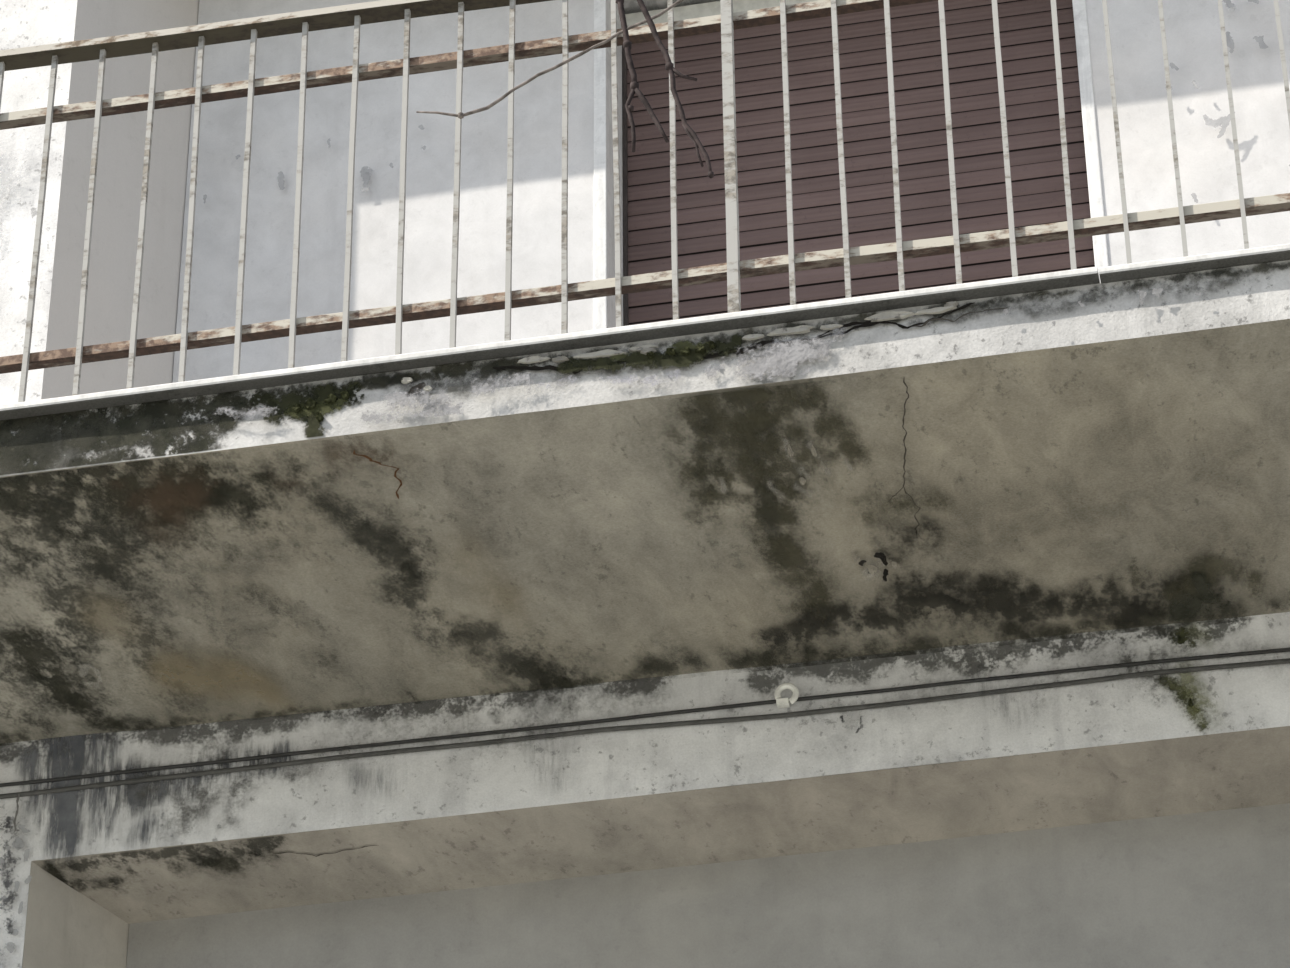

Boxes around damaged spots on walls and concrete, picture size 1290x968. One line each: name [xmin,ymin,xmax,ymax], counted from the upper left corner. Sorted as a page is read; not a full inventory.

leakage [0,360,705,890]
crack [888,379,920,528]
leakage [682,386,1250,693]